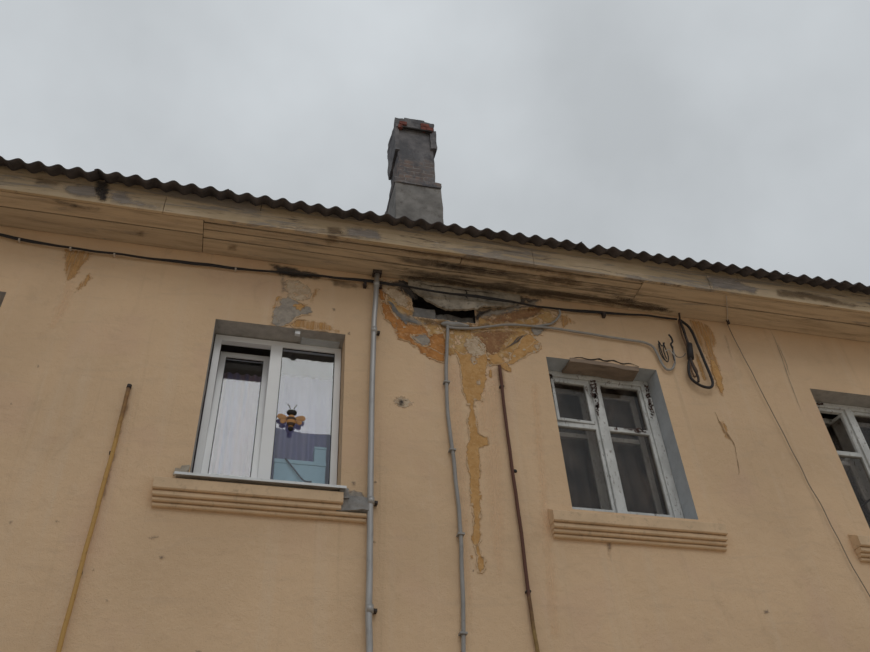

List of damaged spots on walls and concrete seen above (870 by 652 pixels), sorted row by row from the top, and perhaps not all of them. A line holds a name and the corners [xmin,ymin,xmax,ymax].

peeling [269,288,350,334]
leakage [392,254,667,311]
peeling [378,279,571,574]
crack [717,417,739,468]